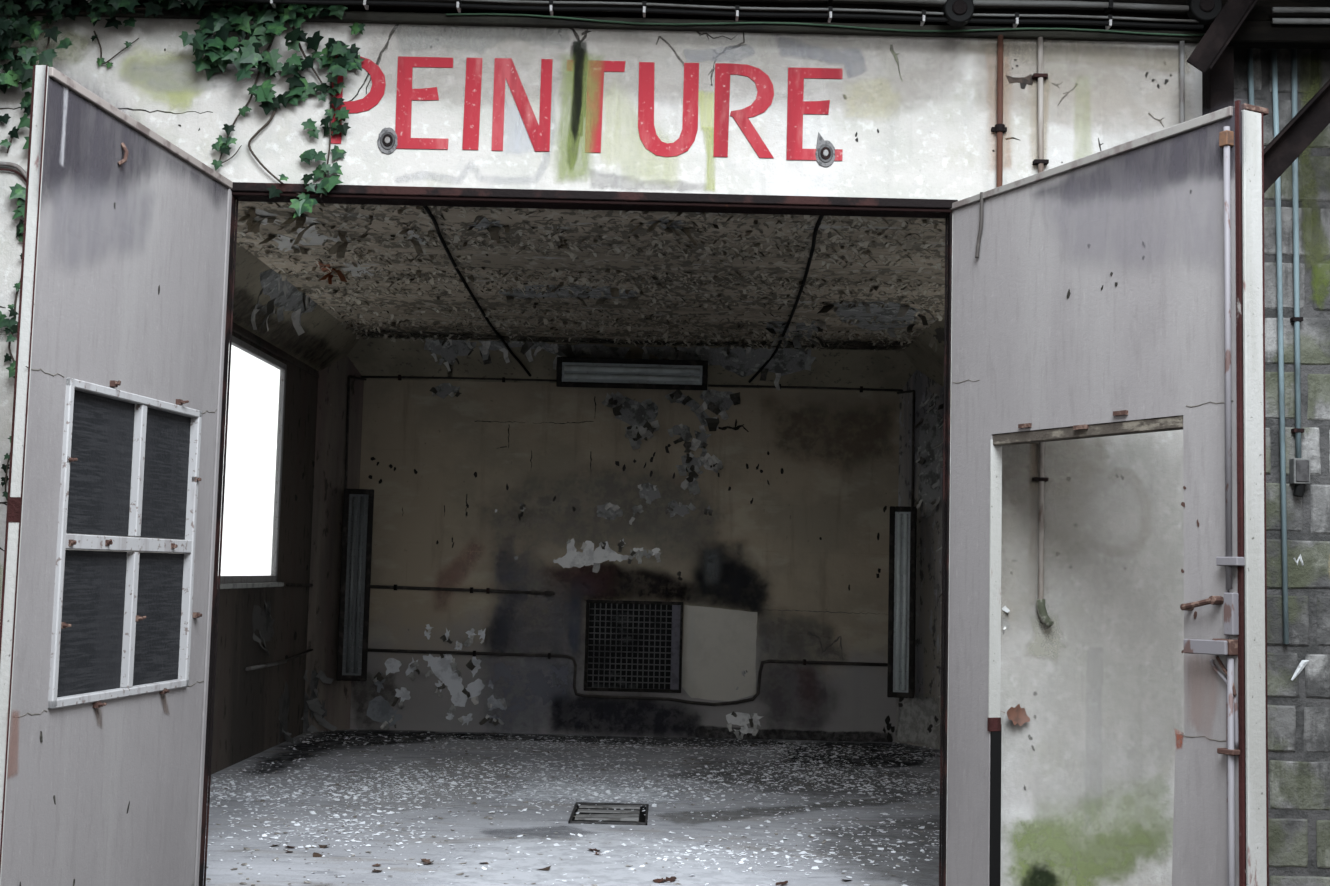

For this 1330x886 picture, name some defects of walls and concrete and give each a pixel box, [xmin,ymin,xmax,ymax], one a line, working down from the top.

peeling [234,201,948,573]
peeling [366,624,507,731]
water stain [249,550,936,824]
peeling [726,670,764,739]
water stain [423,826,779,886]
water stain [823,818,942,886]
water stain [1023,867,1058,886]